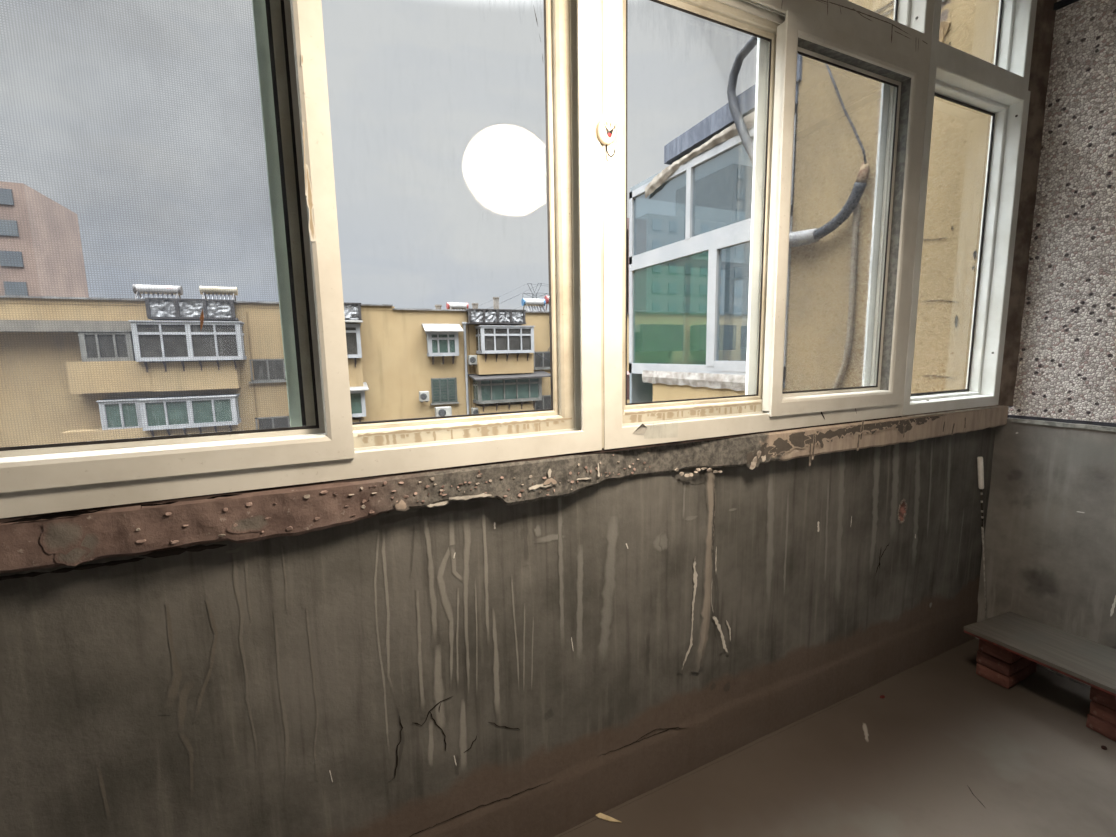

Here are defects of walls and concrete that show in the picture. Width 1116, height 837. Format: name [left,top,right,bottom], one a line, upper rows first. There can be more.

peeling [40,520,104,566]
crack [0,544,227,581]
water stain [557,497,620,675]
spalling [675,467,722,484]
water stain [765,463,790,620]
peeling [747,413,966,470]
water stain [867,440,934,579]
water stain [374,529,406,781]
water stain [410,509,501,780]
crack [390,696,520,781]
crack [599,727,684,756]
crack [410,780,553,837]